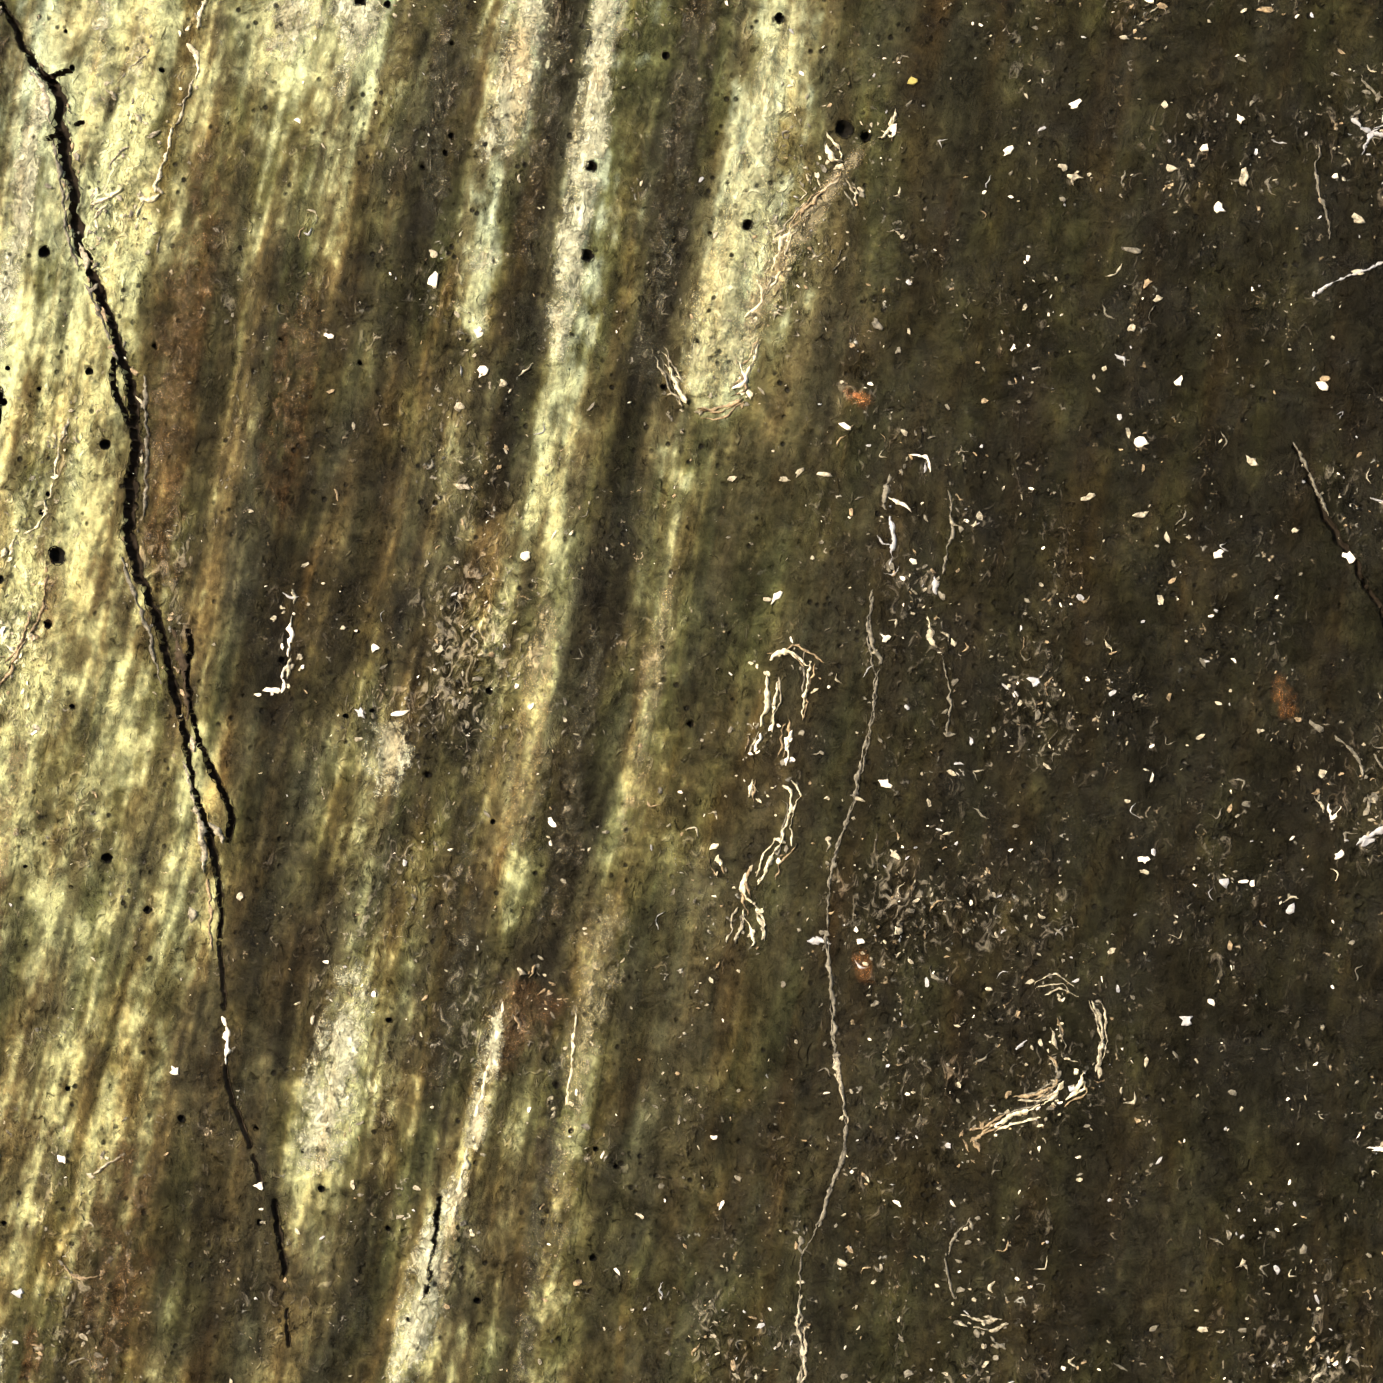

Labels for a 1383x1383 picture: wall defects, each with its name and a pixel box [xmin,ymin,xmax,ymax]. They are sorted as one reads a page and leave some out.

leakage [0,89,46,348]
leakage [264,0,385,96]
leakage [479,0,561,161]
leakage [546,0,620,361]
leakage [683,43,861,391]
leakage [0,735,28,890]
crack [0,0,291,1347]
leakage [365,721,410,796]
leakage [296,964,369,1175]
leakage [464,1013,503,1150]
leakage [549,897,622,1249]
leakage [388,1174,468,1383]